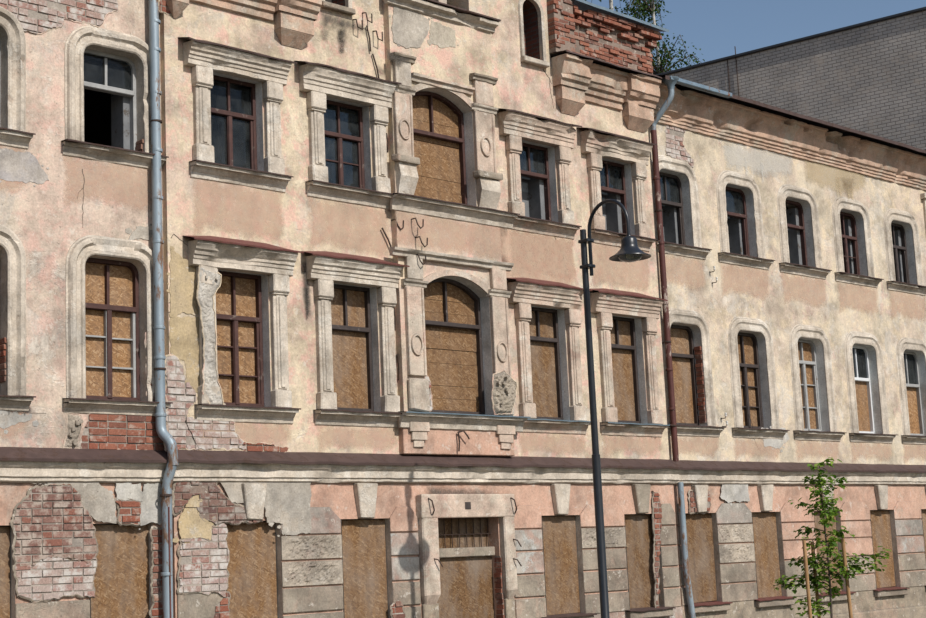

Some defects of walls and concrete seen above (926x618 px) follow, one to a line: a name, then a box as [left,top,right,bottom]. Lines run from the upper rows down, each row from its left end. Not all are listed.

flaking render [0,0,119,35]
flaking render [62,246,289,452]
flaking render [694,346,707,424]
flaking render [10,481,312,618]
flaking render [389,598,406,618]
flaking render [494,556,505,618]
flaking render [651,491,662,608]